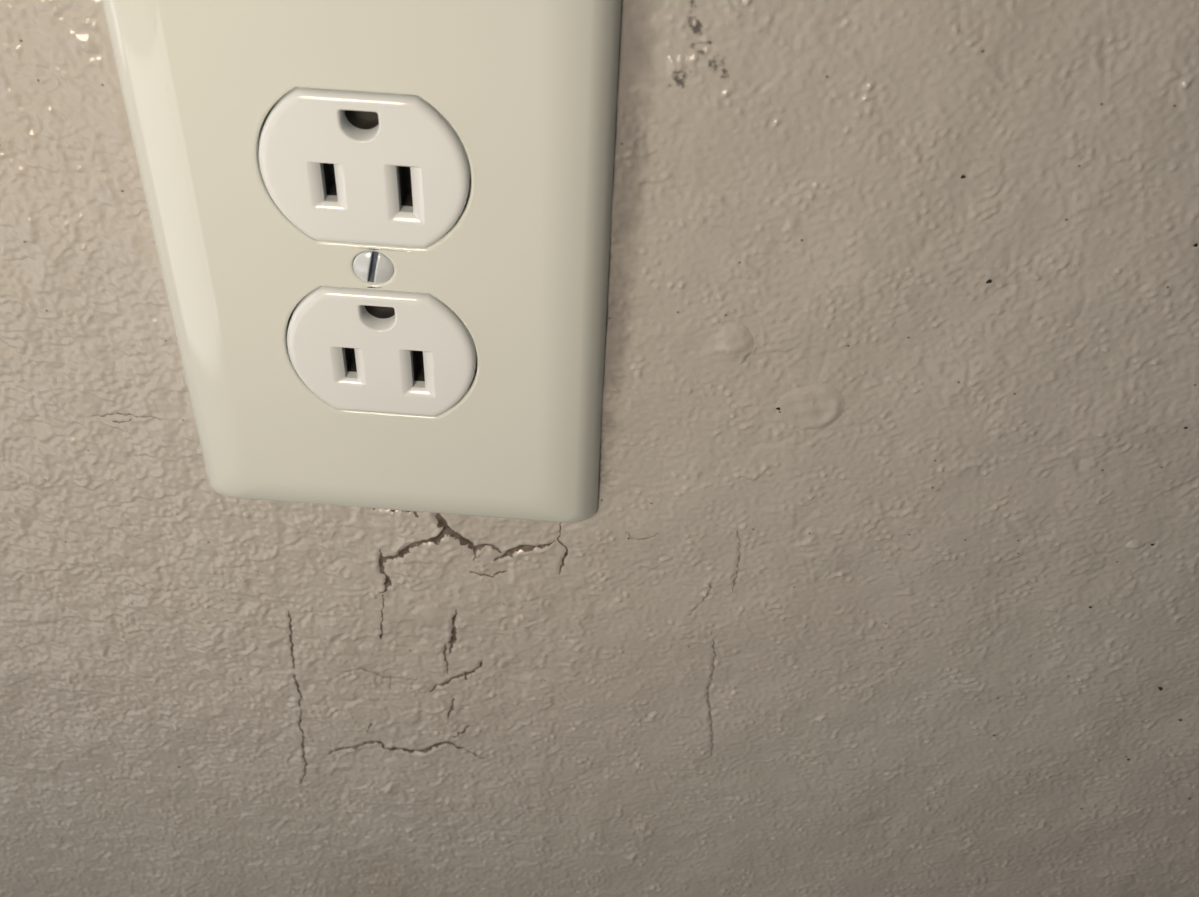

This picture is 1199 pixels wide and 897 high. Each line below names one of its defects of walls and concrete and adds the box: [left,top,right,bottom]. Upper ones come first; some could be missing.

crack [372,508,568,639]
crack [288,609,486,783]